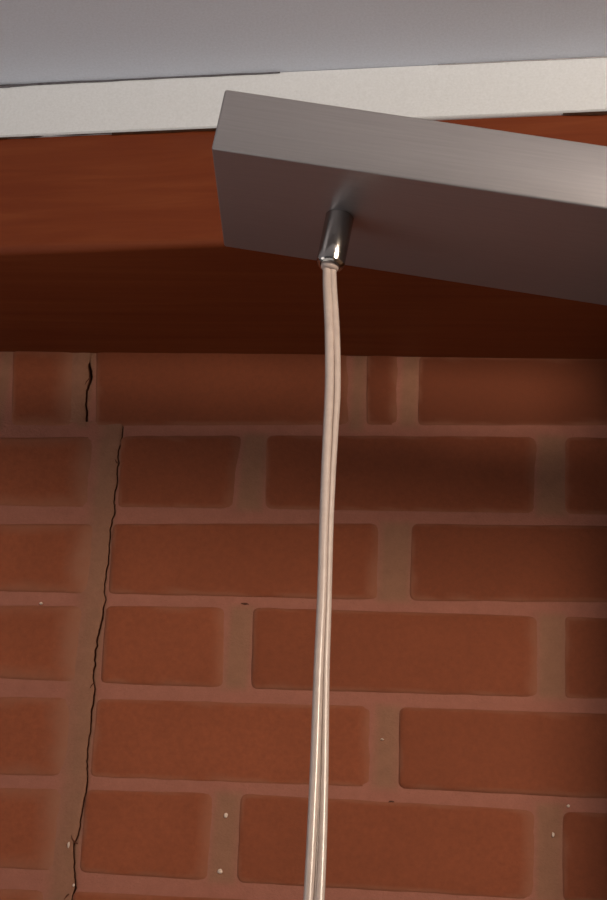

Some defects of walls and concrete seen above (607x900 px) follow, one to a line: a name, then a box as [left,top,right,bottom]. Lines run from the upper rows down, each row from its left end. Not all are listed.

crack [85,362,93,425]
crack [64,428,123,900]